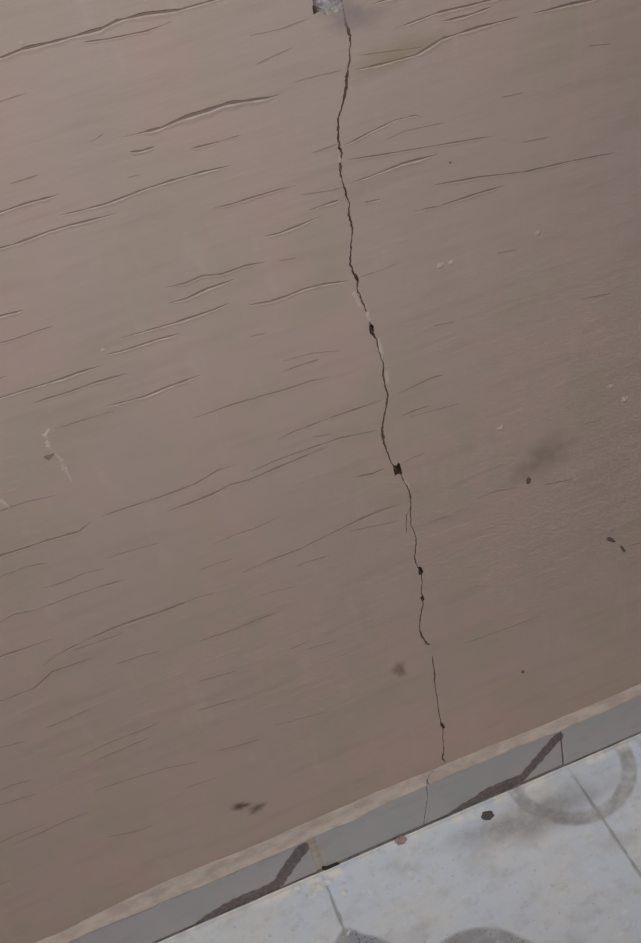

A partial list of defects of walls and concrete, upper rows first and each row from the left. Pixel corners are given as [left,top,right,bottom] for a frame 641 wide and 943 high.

crack [337,8,445,822]